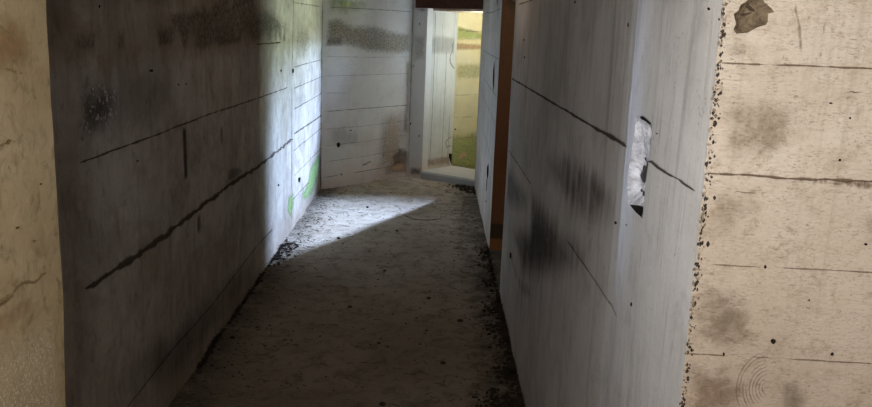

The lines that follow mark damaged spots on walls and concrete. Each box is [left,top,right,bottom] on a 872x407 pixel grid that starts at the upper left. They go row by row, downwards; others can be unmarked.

crack [0,272,47,306]
crack [80,0,410,289]
spalling [627,115,652,219]
spalling [679,0,774,407]